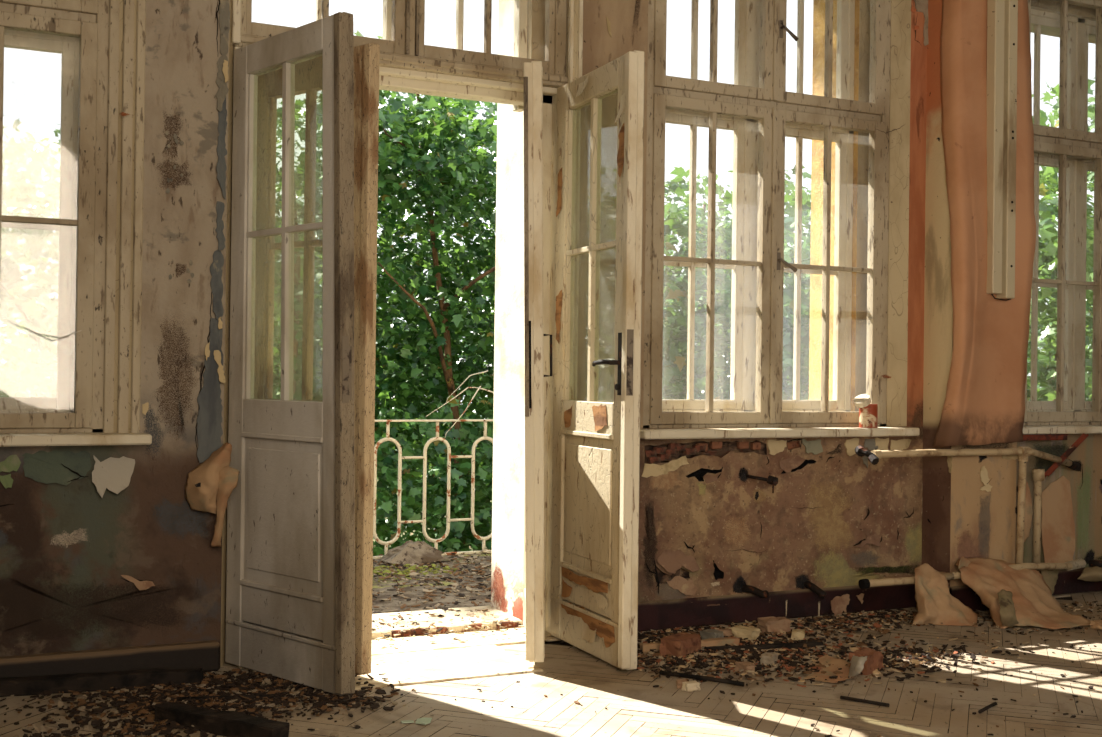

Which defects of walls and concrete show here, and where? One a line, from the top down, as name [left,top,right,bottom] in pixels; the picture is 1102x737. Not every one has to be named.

water stain [157,111,191,194]
peeling [195,55,229,463]
water stain [142,306,199,457]
spalling [642,439,816,478]
spalling [654,549,700,596]
spalling [711,560,724,586]